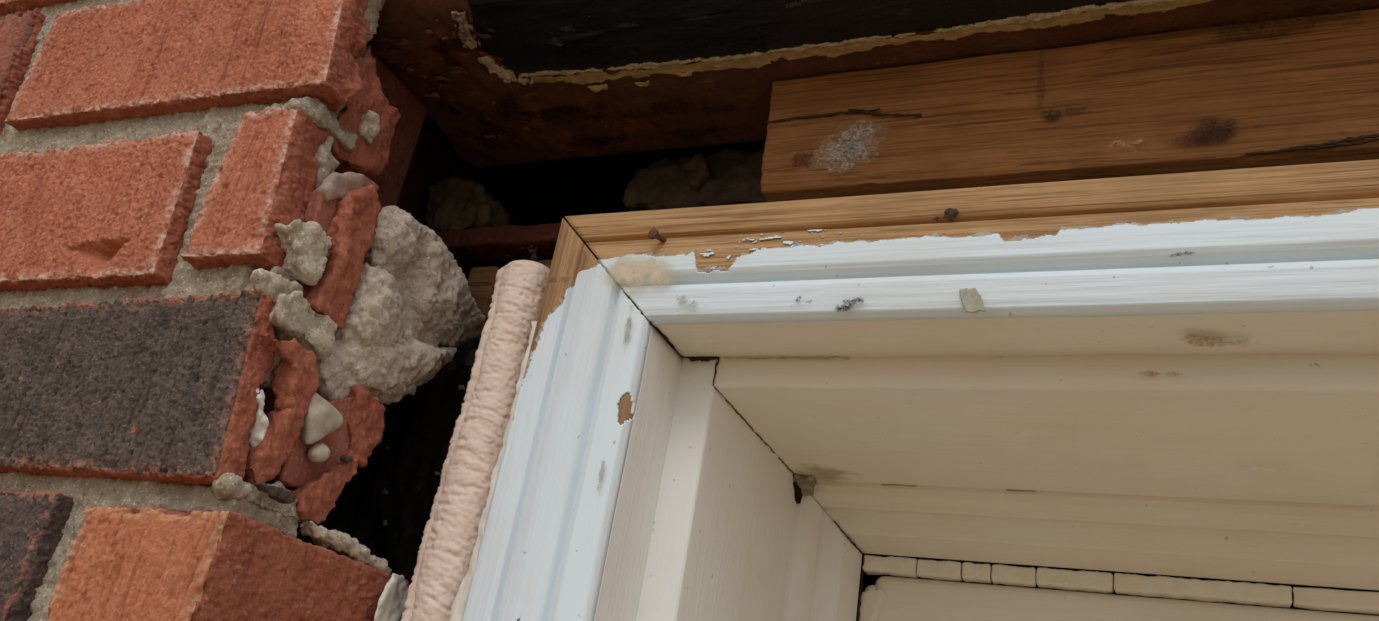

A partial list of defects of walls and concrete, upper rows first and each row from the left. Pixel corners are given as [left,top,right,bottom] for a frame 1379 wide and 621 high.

spalling [135,46,486,574]
crack [765,108,922,123]
peeling [449,207,1379,621]